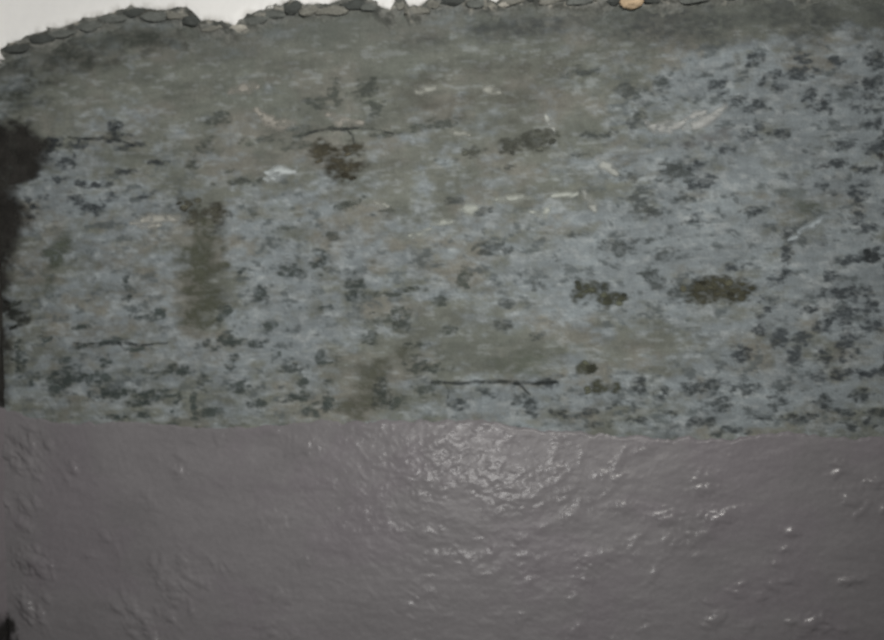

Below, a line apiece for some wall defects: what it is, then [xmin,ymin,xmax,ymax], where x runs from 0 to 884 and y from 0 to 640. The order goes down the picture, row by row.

flaking render [0,0,829,69]
spalling [292,129,363,180]
spalling [500,129,557,154]
damp [0,120,47,407]
damp [181,215,230,327]
spalling [574,281,627,306]
spalling [639,264,756,304]
peeling [754,247,881,361]
peeling [47,357,178,424]
crack [444,380,558,393]
spalling [577,360,621,394]
peeling [817,335,884,380]